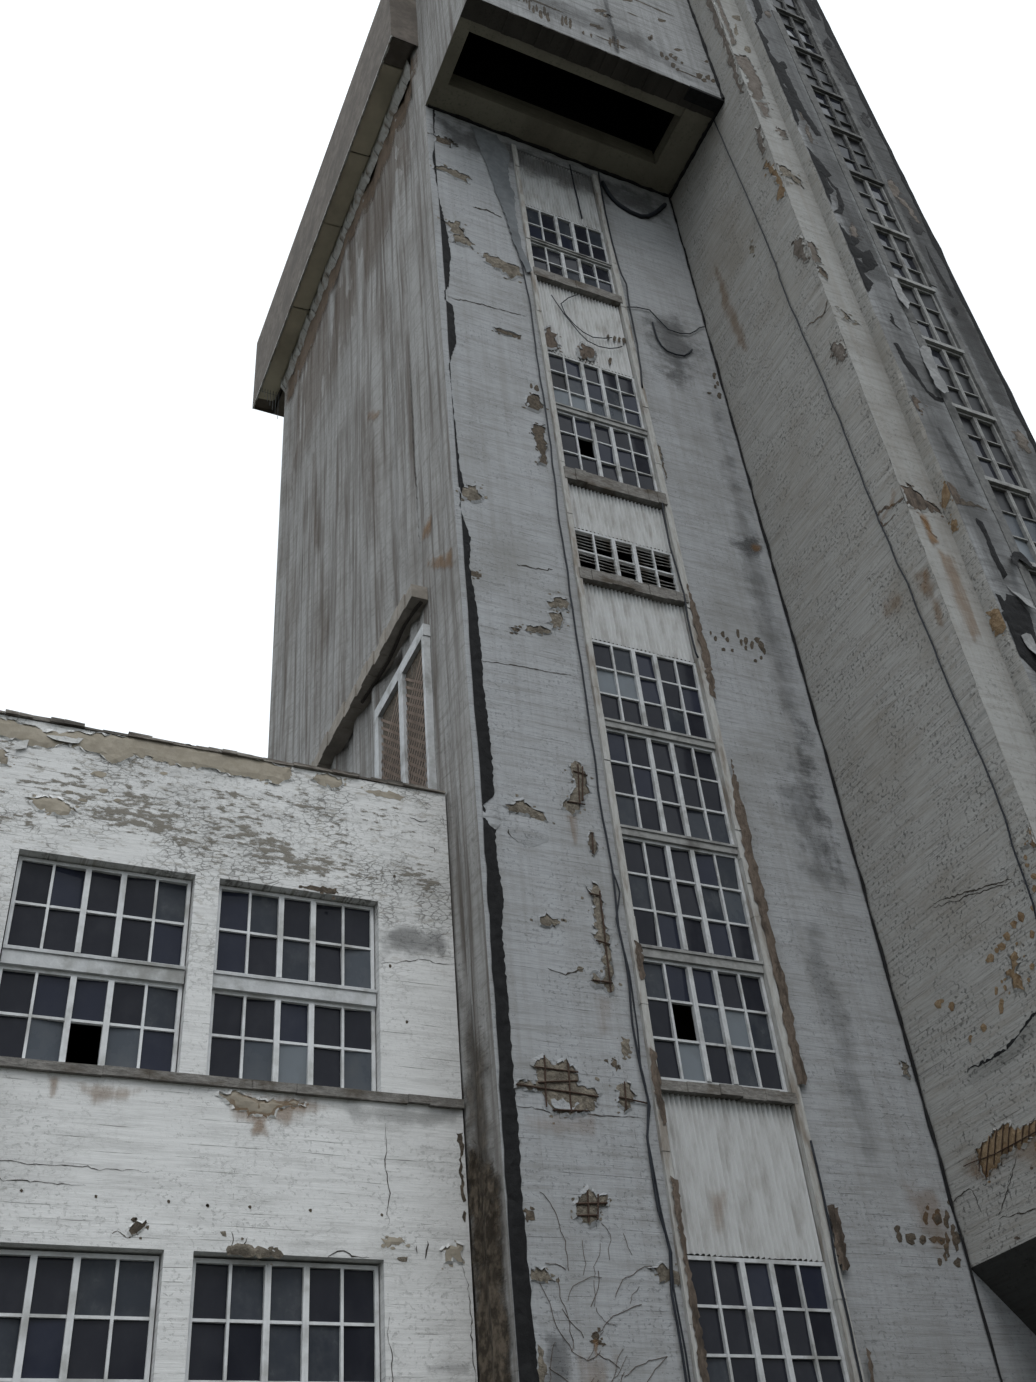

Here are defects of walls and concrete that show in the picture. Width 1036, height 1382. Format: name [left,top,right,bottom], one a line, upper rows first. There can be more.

peeling [518,0,715,83]
spalling [986,606,1006,637]
peeling [0,717,442,900]
spalling [503,759,594,824]
spalling [587,830,604,857]
crack [933,879,1014,908]
spalling [581,880,622,998]
peeling [214,1089,309,1121]
spalling [514,1037,647,1124]
spalling [963,1118,1036,1183]
spalling [571,1184,612,1229]
peeling [894,1201,961,1267]